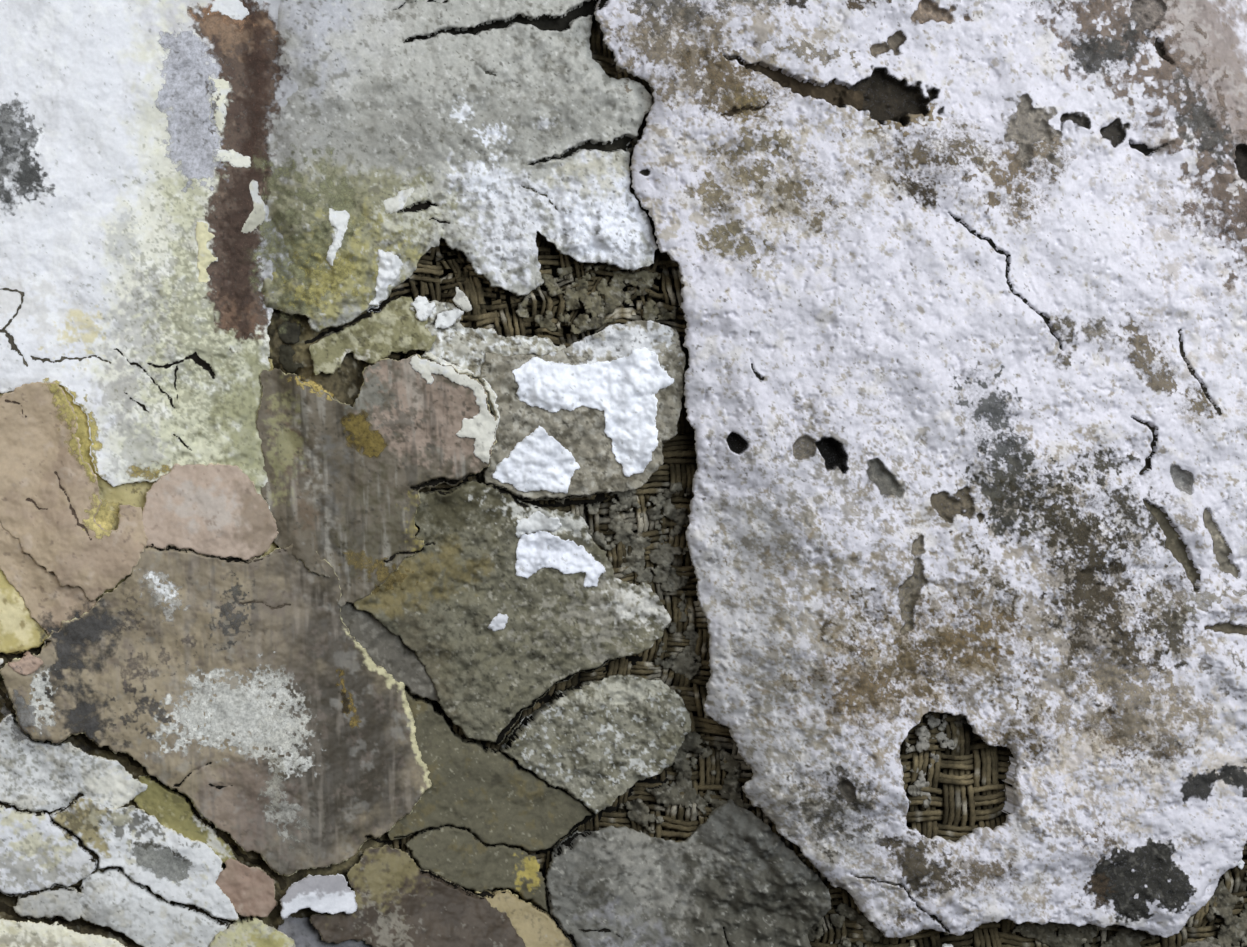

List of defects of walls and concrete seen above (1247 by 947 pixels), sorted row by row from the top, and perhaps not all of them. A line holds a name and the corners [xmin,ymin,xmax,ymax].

crack [398,0,608,43]
water stain [0,93,55,216]
crack [0,288,215,451]
flaking render [411,287,472,329]
peeling [409,352,580,494]
peeling [512,347,674,477]
crack [949,212,1062,349]
crack [1131,415,1158,475]
peeling [515,511,606,588]
peeling [0,382,574,947]
water stain [787,763,1012,928]
water stain [1079,821,1196,923]